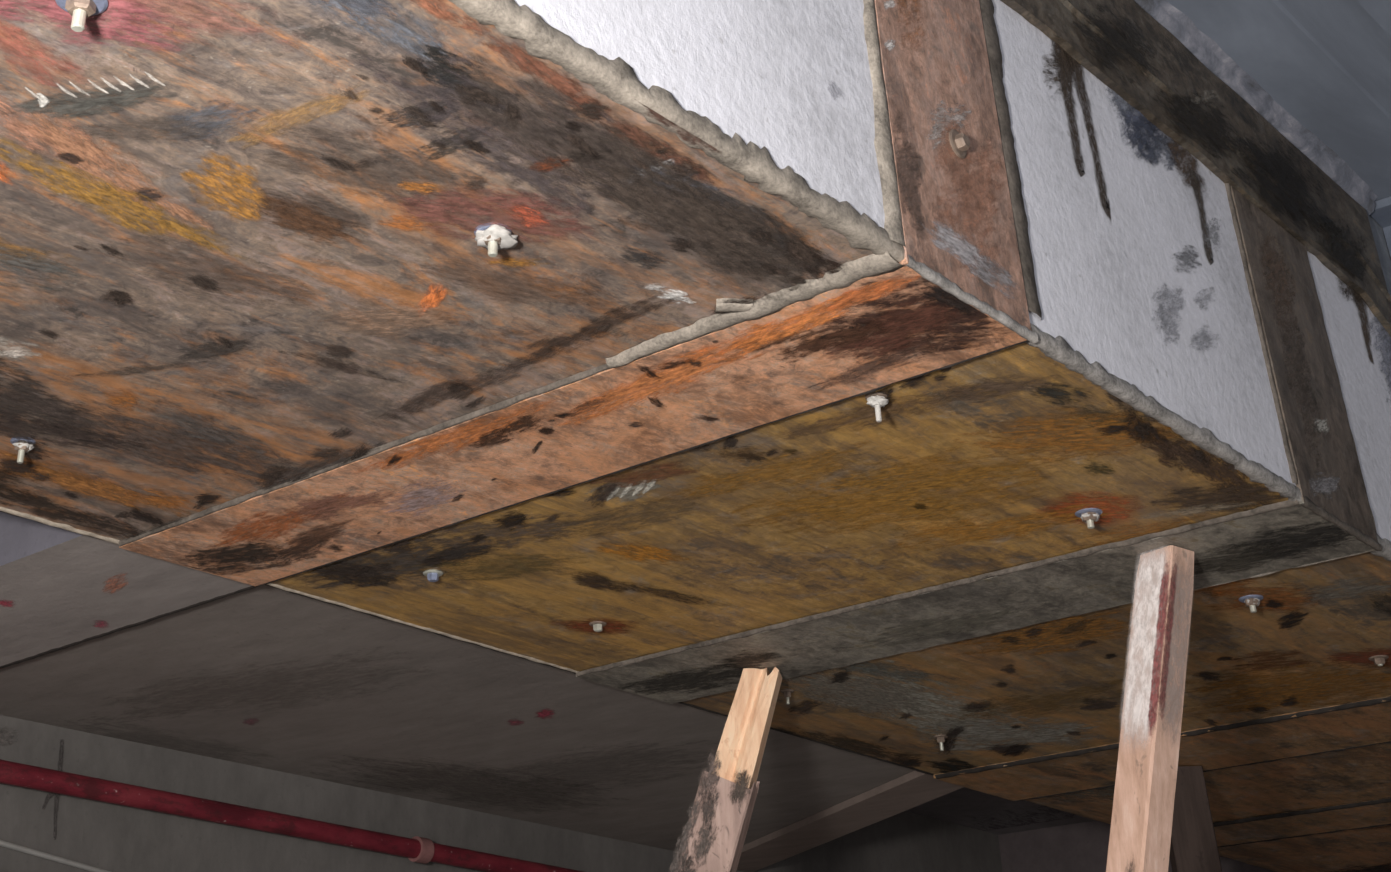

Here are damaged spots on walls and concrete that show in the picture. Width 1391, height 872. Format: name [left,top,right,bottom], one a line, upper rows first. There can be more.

leakage [645,106,719,152]
leakage [623,248,665,269]
rust [1044,492,1133,524]